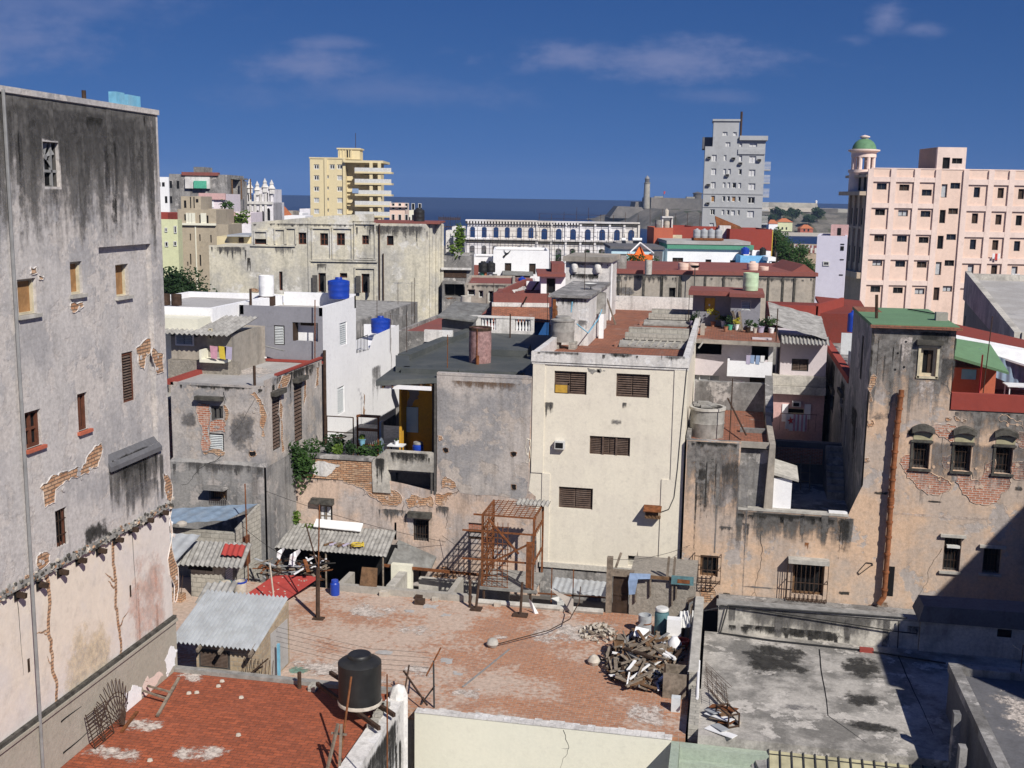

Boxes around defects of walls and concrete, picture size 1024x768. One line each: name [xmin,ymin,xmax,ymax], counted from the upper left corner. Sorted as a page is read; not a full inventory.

damp [0,93,157,244]
spalling [135,338,171,375]
spalling [40,442,103,508]
spalling [196,402,229,457]
damp [230,414,254,448]
spalling [250,374,291,453]
peeling [308,461,340,477]
spalling [343,476,458,508]
damp [686,441,854,553]
spalling [900,414,1024,505]
damp [729,607,890,678]